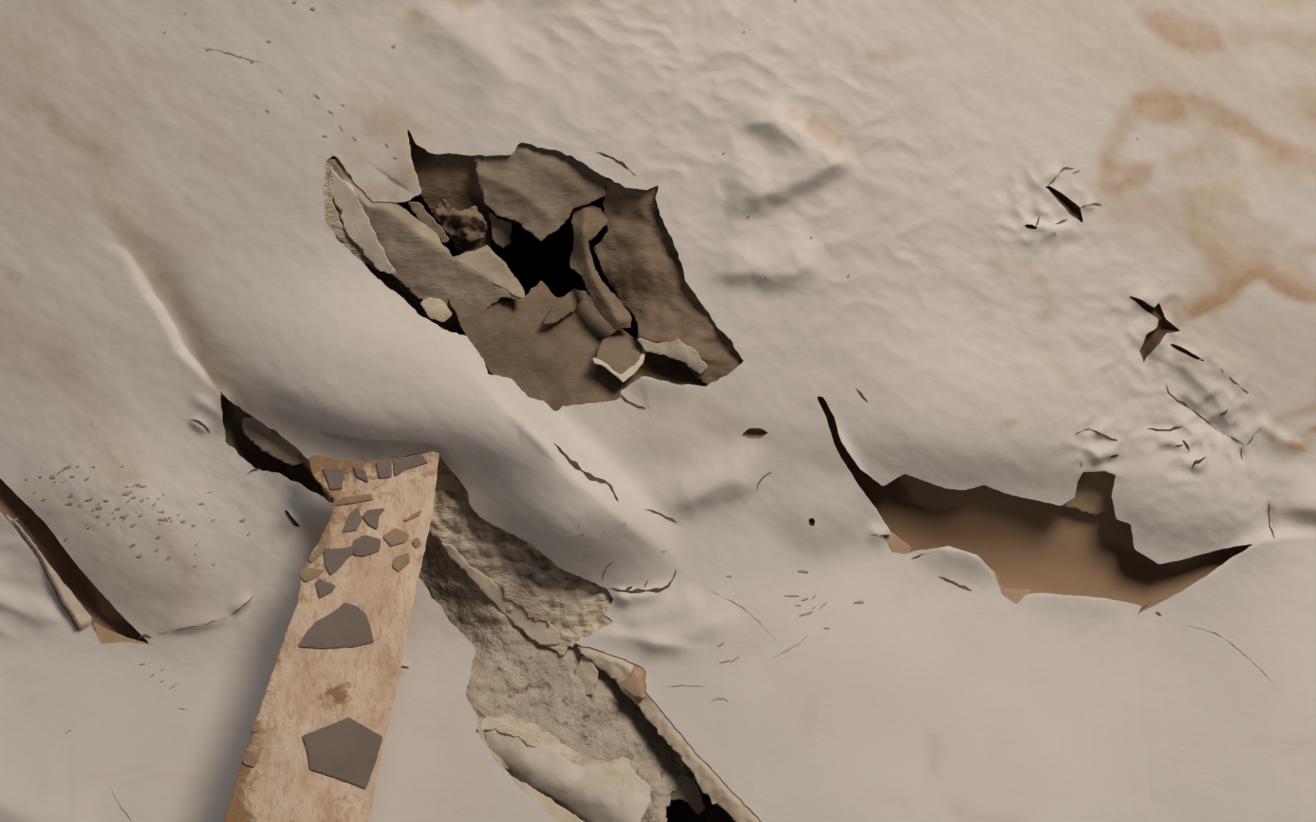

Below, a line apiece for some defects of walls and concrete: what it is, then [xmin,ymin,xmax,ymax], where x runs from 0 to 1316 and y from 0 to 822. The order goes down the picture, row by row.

peeling [26,465,196,559]
flaking render [298,455,428,598]
flaking render [299,603,374,649]
peeling [441,542,560,645]
flaking render [303,717,383,789]
spalling [578,645,762,822]